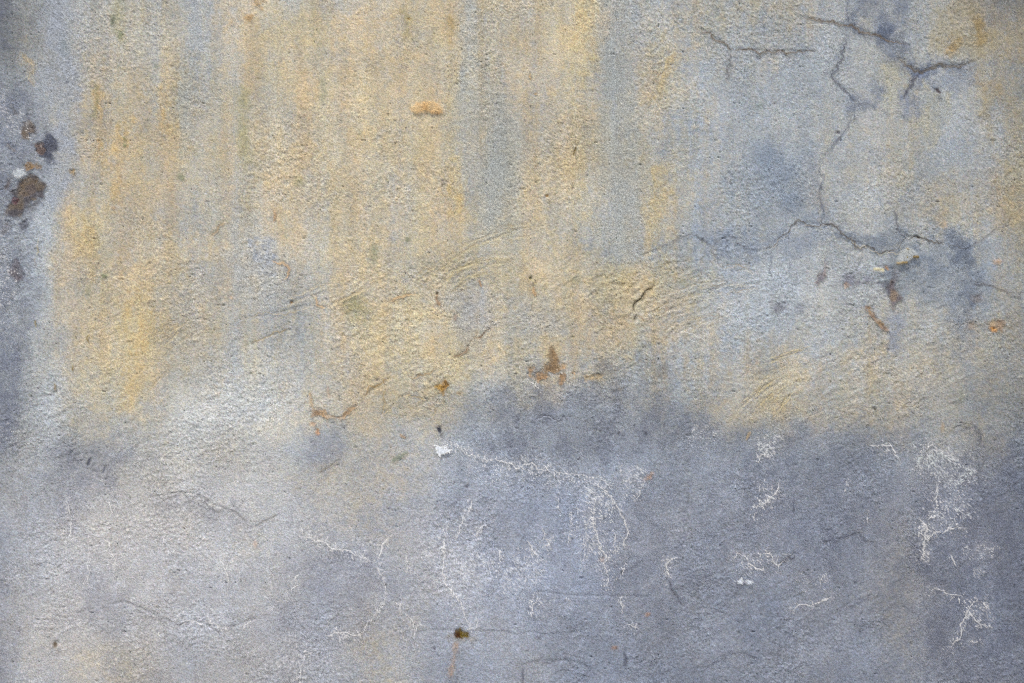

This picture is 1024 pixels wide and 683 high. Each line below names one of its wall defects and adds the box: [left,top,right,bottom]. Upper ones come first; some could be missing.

crack [701,30,804,76]
crack [808,4,969,144]
crack [769,168,979,271]
water stain [434,444,451,457]